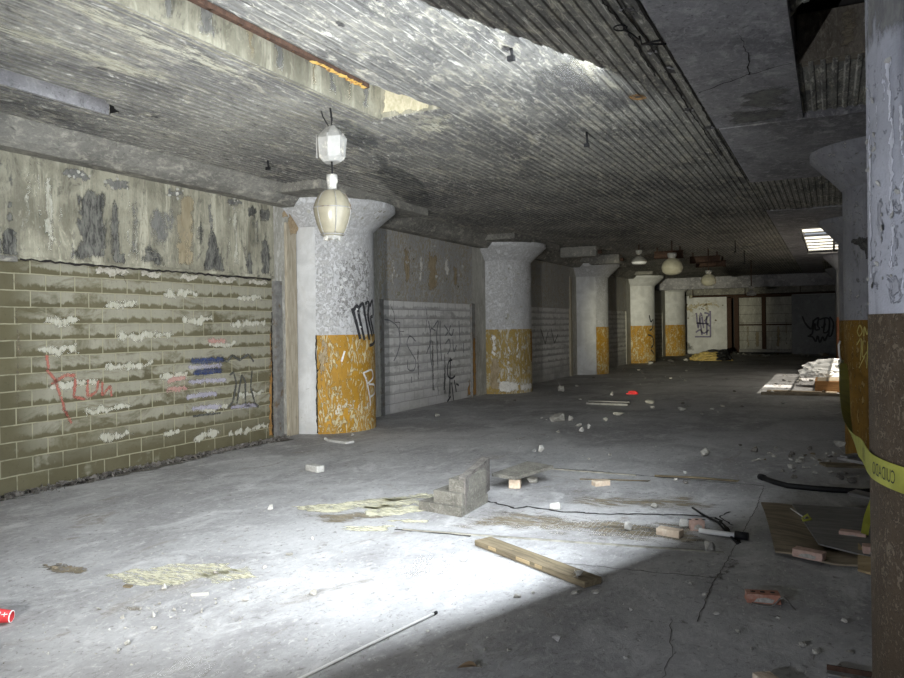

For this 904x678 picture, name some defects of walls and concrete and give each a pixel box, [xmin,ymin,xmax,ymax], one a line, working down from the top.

spalling [383,90,450,123]
peeling [851,57,904,294]
leakage [0,202,18,255]
leakage [72,189,175,266]
leakage [198,204,270,274]
leakage [45,316,79,327]
leakage [38,344,76,356]
peeling [318,340,375,428]
leakage [100,430,129,442]
leakage [194,423,268,442]
crack [394,529,471,537]
crack [488,475,764,622]